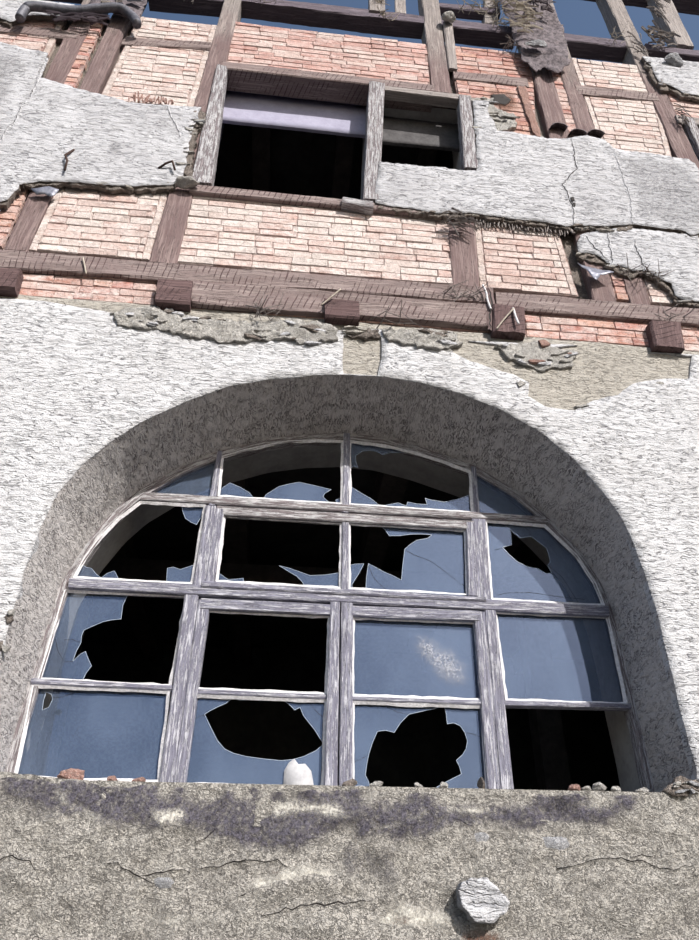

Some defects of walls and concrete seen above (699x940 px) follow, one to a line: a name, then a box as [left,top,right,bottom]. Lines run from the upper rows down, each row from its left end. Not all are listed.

peeling [185,118,206,131]
spalling [470,85,543,137]
peeling [571,223,615,232]
crack [560,138,647,271]
spalling [110,306,696,410]
water stain [1,777,635,848]
crack [107,827,289,887]
crack [556,852,697,872]
crack [237,891,369,918]